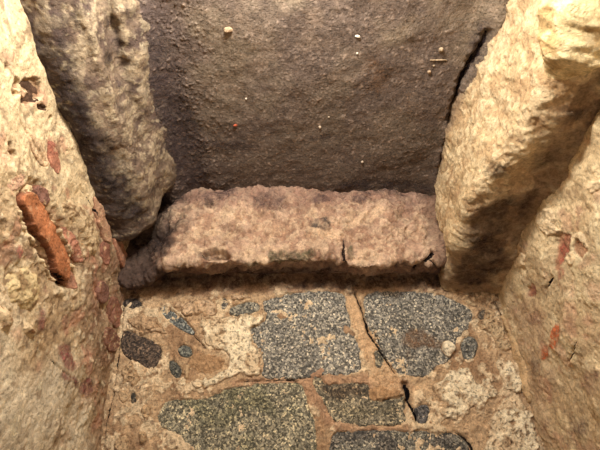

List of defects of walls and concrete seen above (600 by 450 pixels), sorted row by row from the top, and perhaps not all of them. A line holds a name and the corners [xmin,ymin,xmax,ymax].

spalling [12,81,46,111]
crack [448,30,487,119]
crack [355,296,417,421]